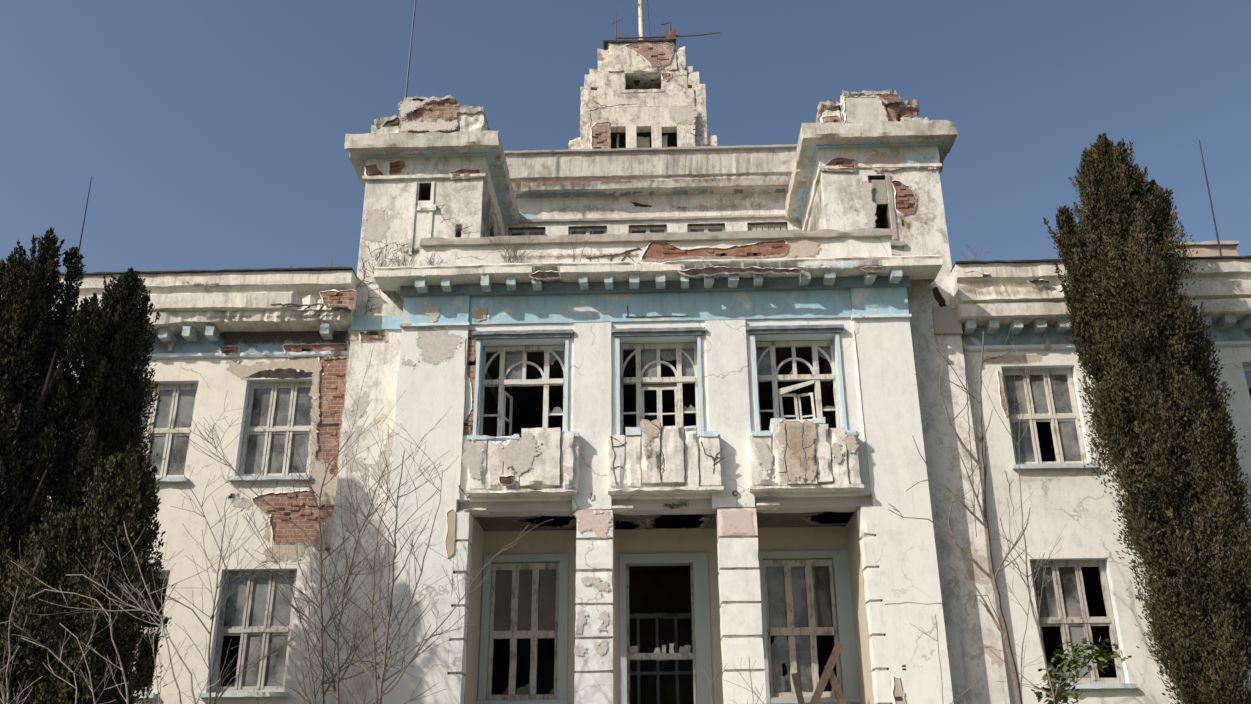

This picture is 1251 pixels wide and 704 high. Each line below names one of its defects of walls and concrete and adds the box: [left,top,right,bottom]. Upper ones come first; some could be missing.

flaking render [872,94,901,104]
flaking render [589,121,611,149]
flaking render [819,149,936,228]
flaking render [641,238,820,277]
flaking render [319,289,357,310]
peeling [402,303,541,486]
flaking render [219,326,395,565]
peeling [640,419,661,456]
peeling [755,417,817,483]
peeling [570,508,613,539]
peeling [581,574,610,594]
peeling [574,607,611,661]